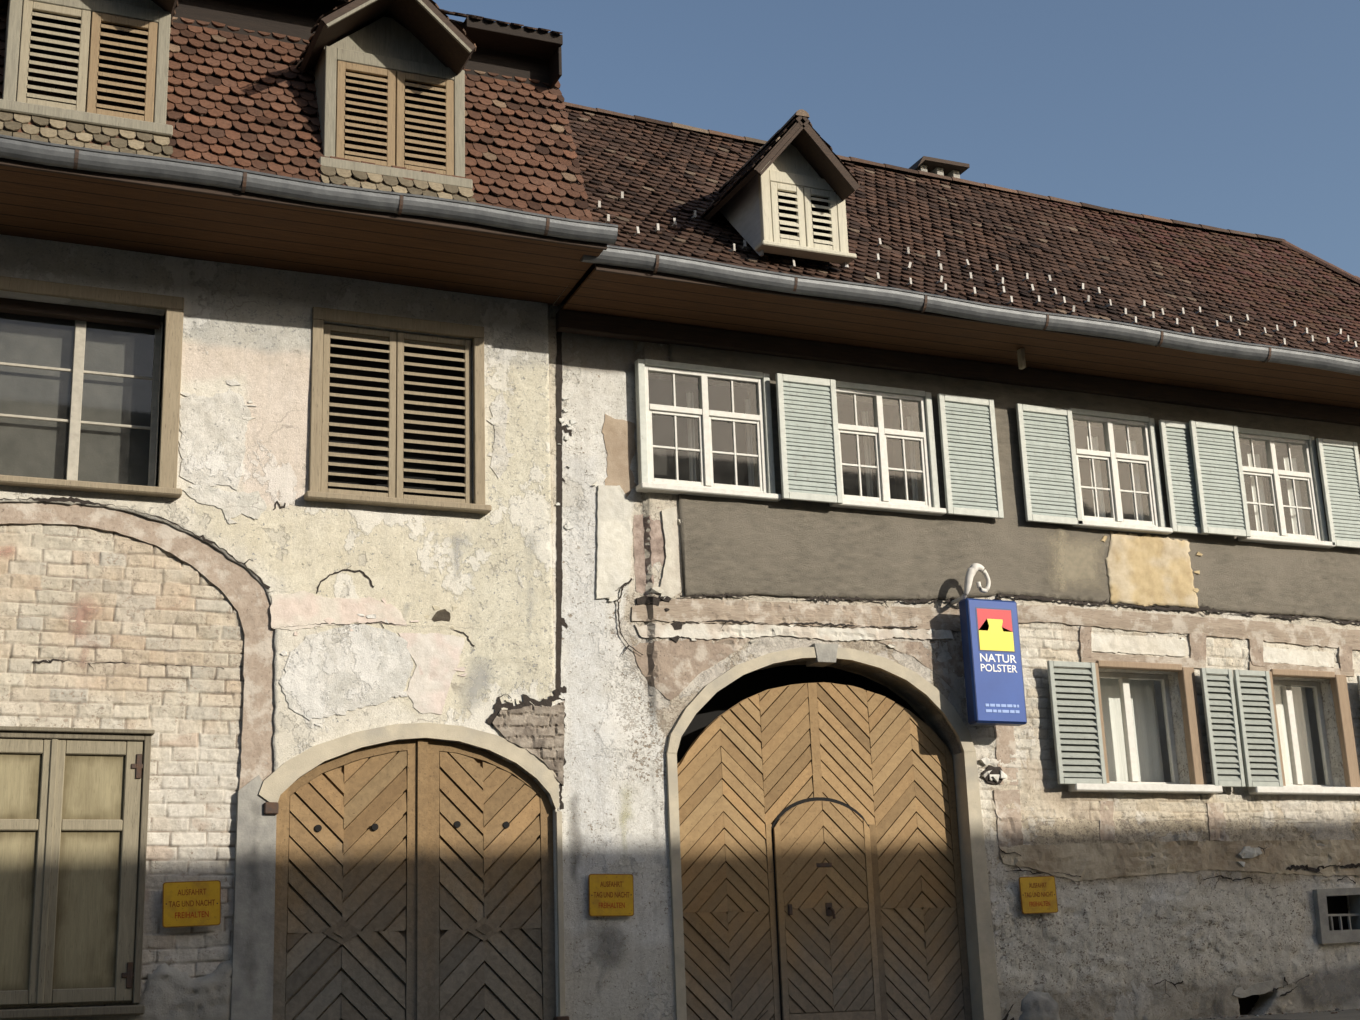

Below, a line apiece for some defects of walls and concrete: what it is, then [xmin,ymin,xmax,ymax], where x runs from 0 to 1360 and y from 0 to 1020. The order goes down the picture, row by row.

crack [0,496,475,646]
peeling [269,591,467,727]
peeling [592,481,632,602]
crack [615,578,643,655]
peeling [634,507,954,648]
spalling [492,699,565,786]
spalling [1237,846,1262,867]
spalling [1238,995,1259,1015]